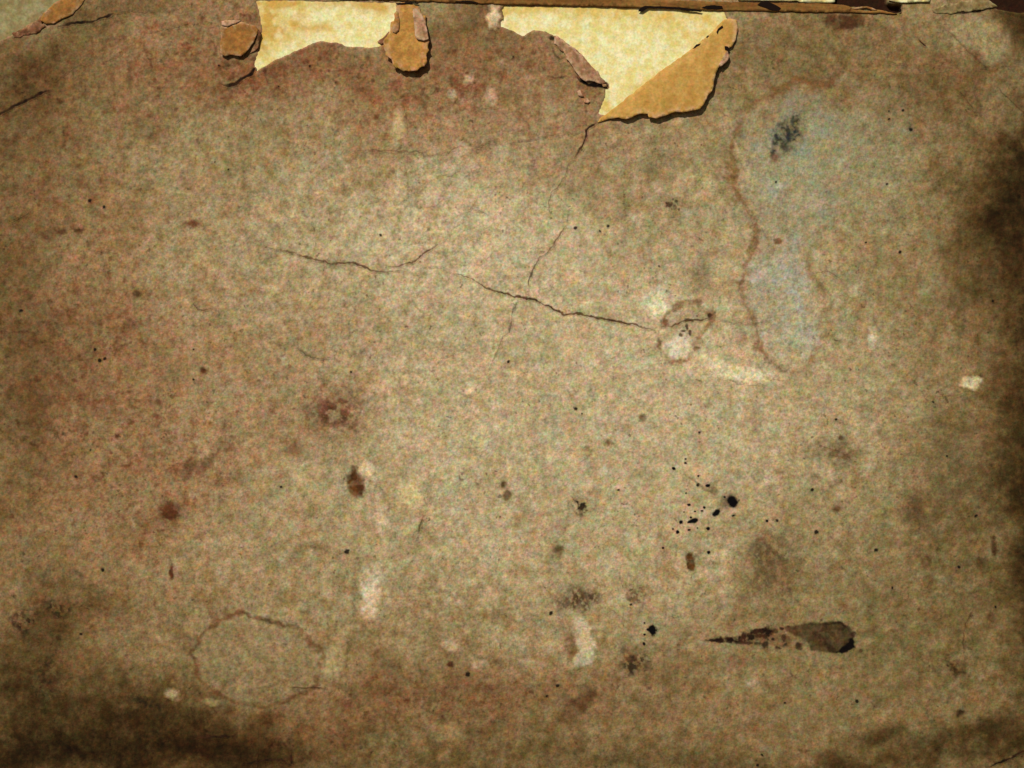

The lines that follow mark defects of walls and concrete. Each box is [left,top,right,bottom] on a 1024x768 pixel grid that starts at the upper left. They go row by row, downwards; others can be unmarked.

peeling [0,0,84,41]
peeling [220,0,429,72]
peeling [500,6,738,123]
crack [261,122,773,409]
damp [653,48,930,382]
damp [5,593,83,705]
damp [184,604,330,716]
crack [287,685,335,697]